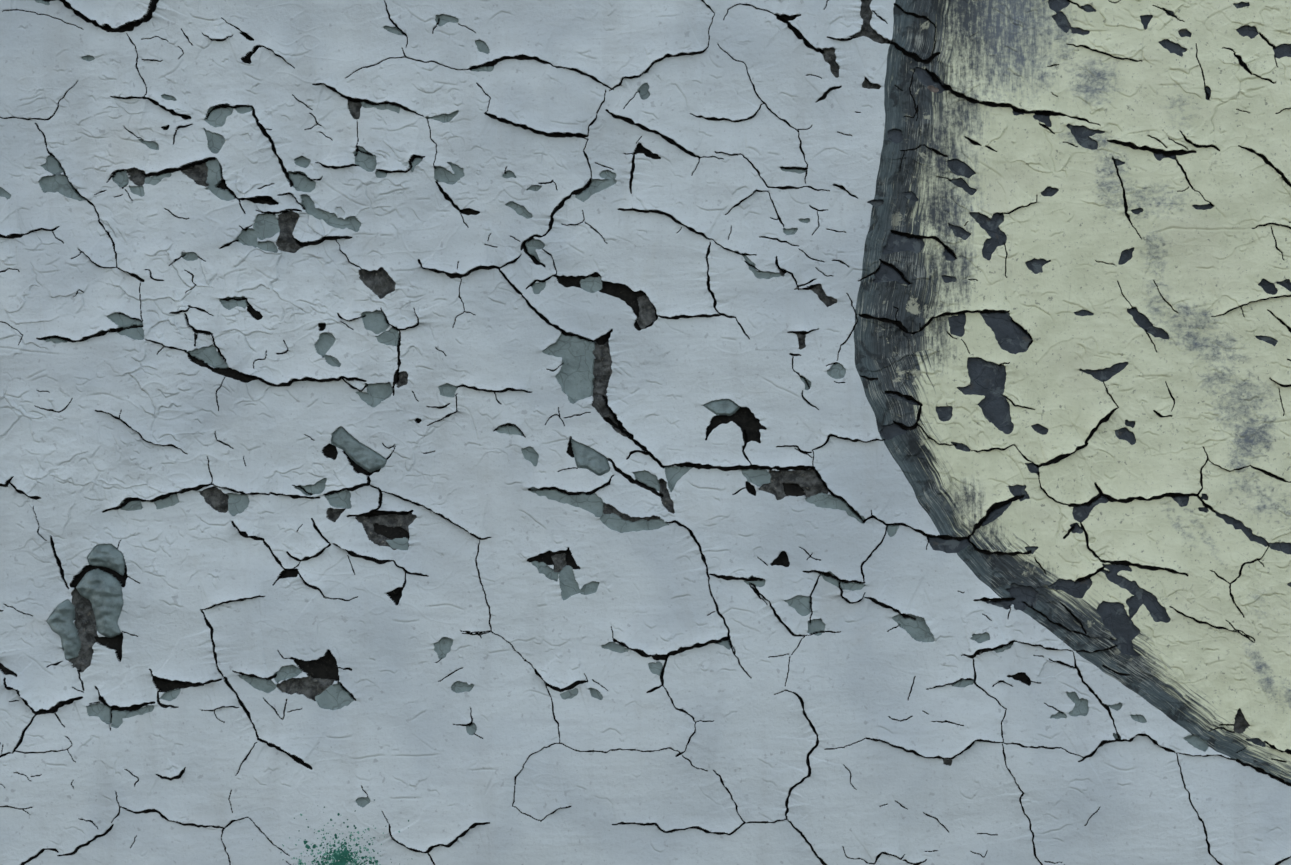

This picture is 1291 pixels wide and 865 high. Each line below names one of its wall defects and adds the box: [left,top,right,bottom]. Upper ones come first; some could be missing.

crack [2,0,333,145]
peeling [219,83,532,426]
crack [346,0,858,339]
crack [888,3,1291,239]
peeling [102,426,417,550]
spalling [528,329,865,533]
peeling [947,310,1048,435]
crack [776,376,1291,574]
peeling [1006,494,1255,649]
crack [0,518,429,865]
spalling [86,649,356,731]
crack [382,491,1291,865]